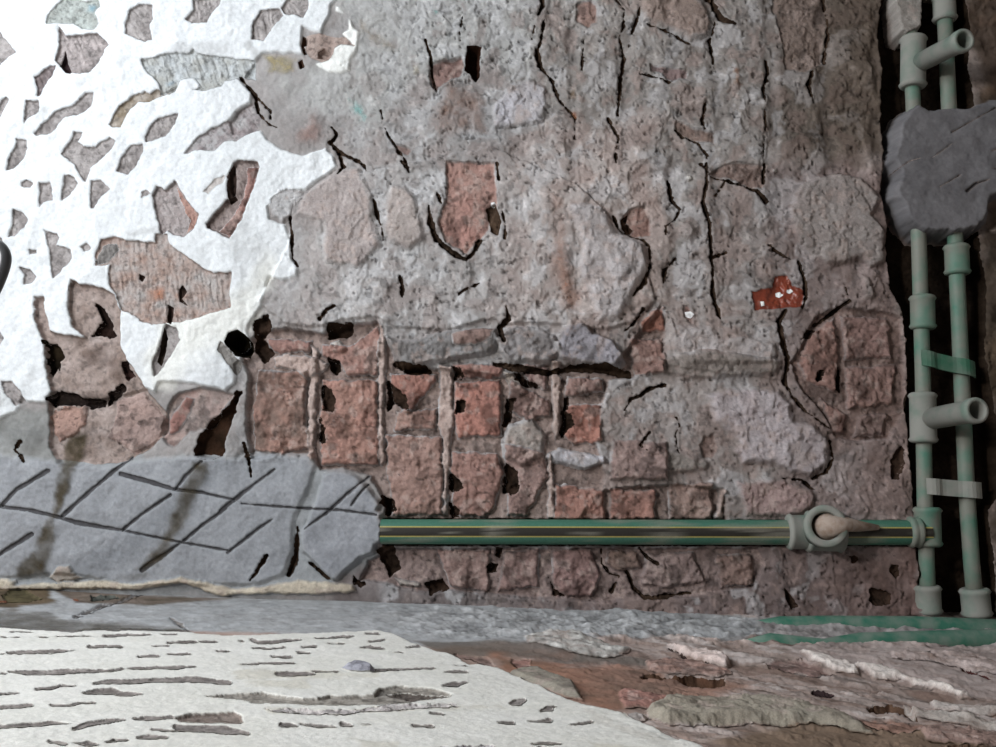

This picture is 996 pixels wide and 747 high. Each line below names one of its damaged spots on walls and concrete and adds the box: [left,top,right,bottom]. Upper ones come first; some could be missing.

peeling [6,0,108,170]
peeling [21,49,261,208]
peeling [251,0,309,41]
crack [427,192,507,261]
crack [607,0,737,163]
crack [612,60,769,331]
spalling [33,159,728,520]
crack [493,305,667,411]
crack [768,244,851,493]
spalling [790,307,907,442]
crack [249,526,331,582]
spalling [353,544,765,603]